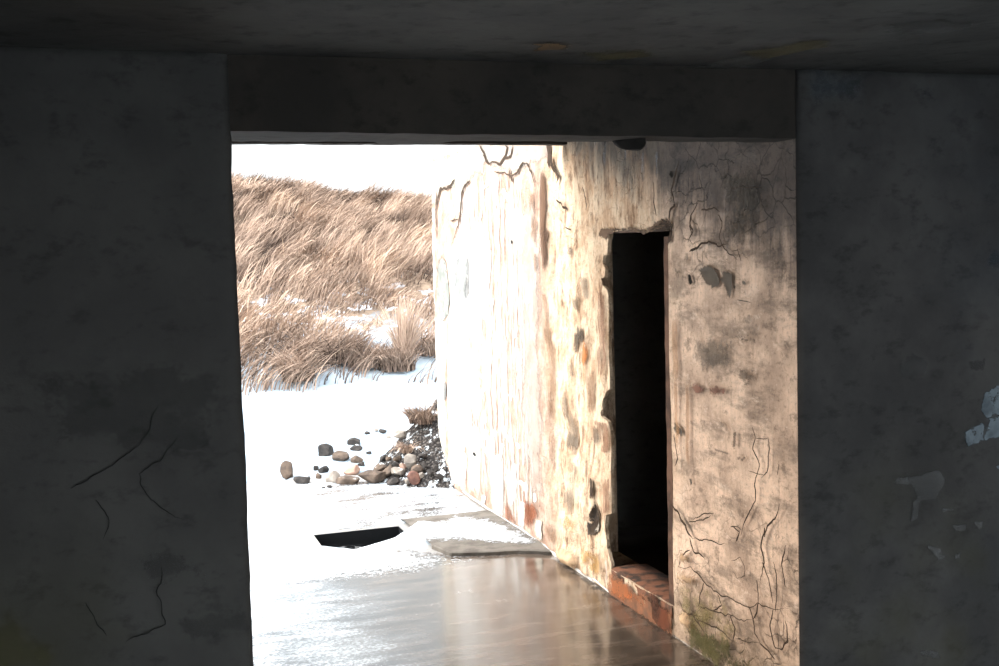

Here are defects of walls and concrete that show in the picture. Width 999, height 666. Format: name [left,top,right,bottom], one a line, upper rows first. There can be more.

crack [435,179,470,243]
crack [480,145,587,230]
crack [653,162,741,260]
spalling [688,266,750,303]
spalling [597,293,606,371]
peeling [965,386,999,447]
crack [72,407,181,539]
spalling [587,478,609,535]
crack [671,427,788,659]
crack [86,567,166,641]
rust [608,574,672,635]